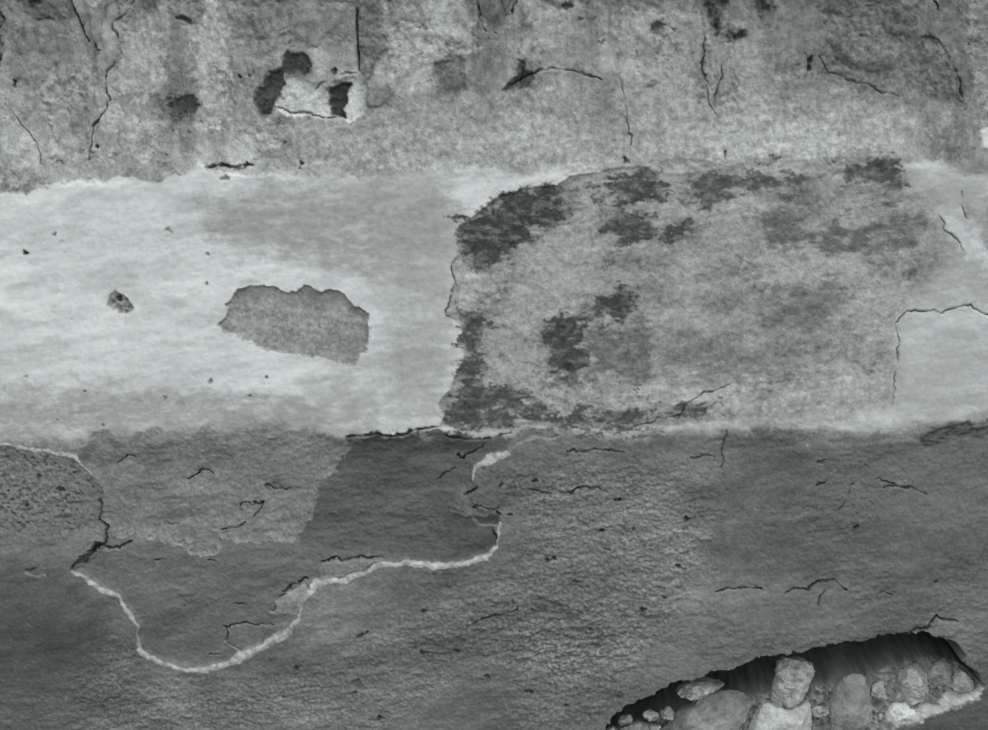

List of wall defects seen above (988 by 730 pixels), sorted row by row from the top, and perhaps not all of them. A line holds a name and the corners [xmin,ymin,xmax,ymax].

spalling [238,0,396,124]
water stain [182,164,575,301]
water stain [582,154,806,257]
water stain [757,151,931,342]
crack [348,426,442,438]
peeling [0,150,988,674]
water stain [382,280,773,448]
crack [473,606,519,625]
spalling [606,680,691,730]
spalling [705,614,988,730]